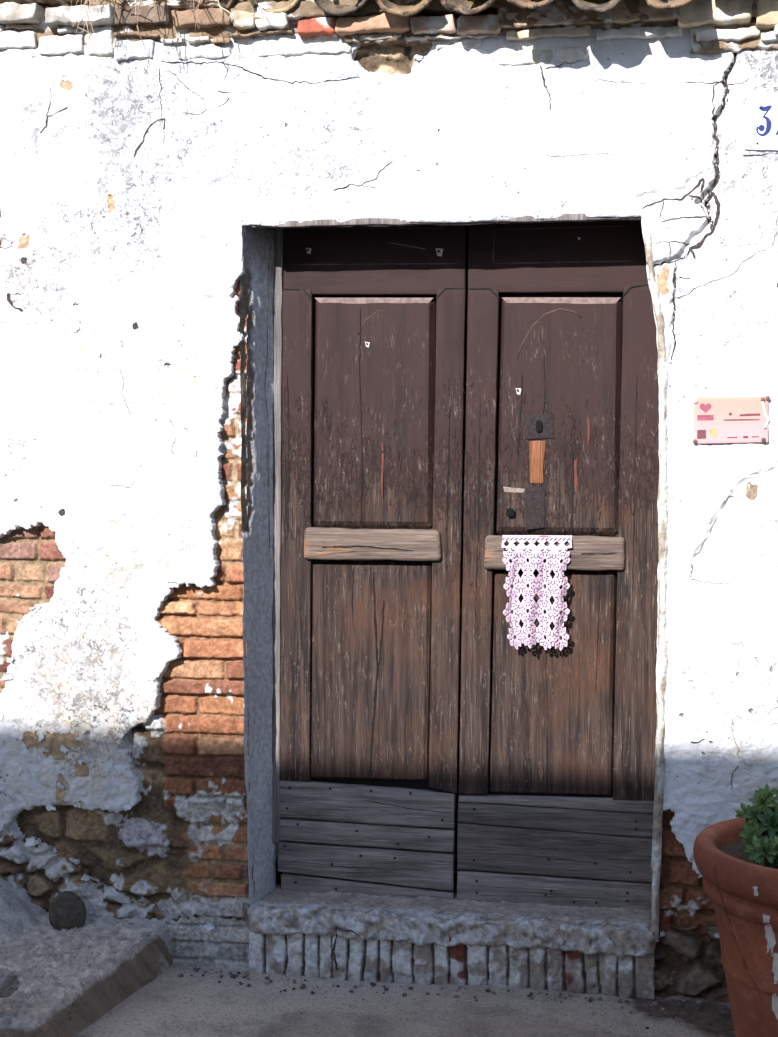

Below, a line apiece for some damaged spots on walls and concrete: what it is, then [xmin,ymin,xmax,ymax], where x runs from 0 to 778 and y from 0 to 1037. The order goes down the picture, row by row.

crack [133,61,362,158]
flaking render [354,43,432,75]
peeling [0,233,29,264]
crack [597,52,778,364]
crack [690,468,772,588]
flaking render [0,280,255,931]
flaking render [650,806,730,1003]